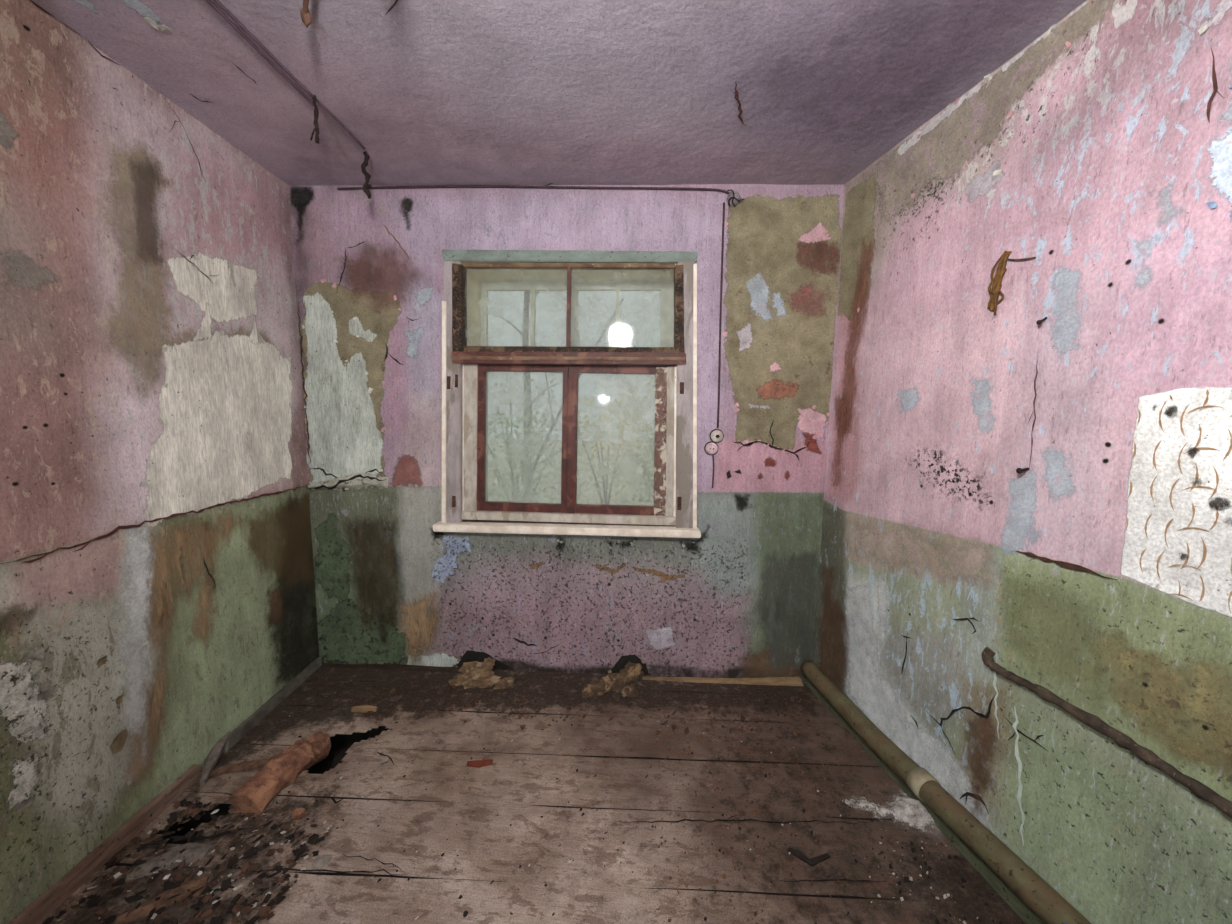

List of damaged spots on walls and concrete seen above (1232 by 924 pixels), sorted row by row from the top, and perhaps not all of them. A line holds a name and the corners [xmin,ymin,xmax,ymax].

crack [30,0,121,66]
water stain [133,164,158,261]
water stain [348,247,432,307]
peeling [722,0,1114,453]
peeling [1206,83,1232,218]
peeling [0,607,34,632]
peeling [97,252,402,785]
water stain [271,498,319,682]
water stain [348,520,400,642]
spalling [0,649,58,813]
water stain [1102,632,1232,769]